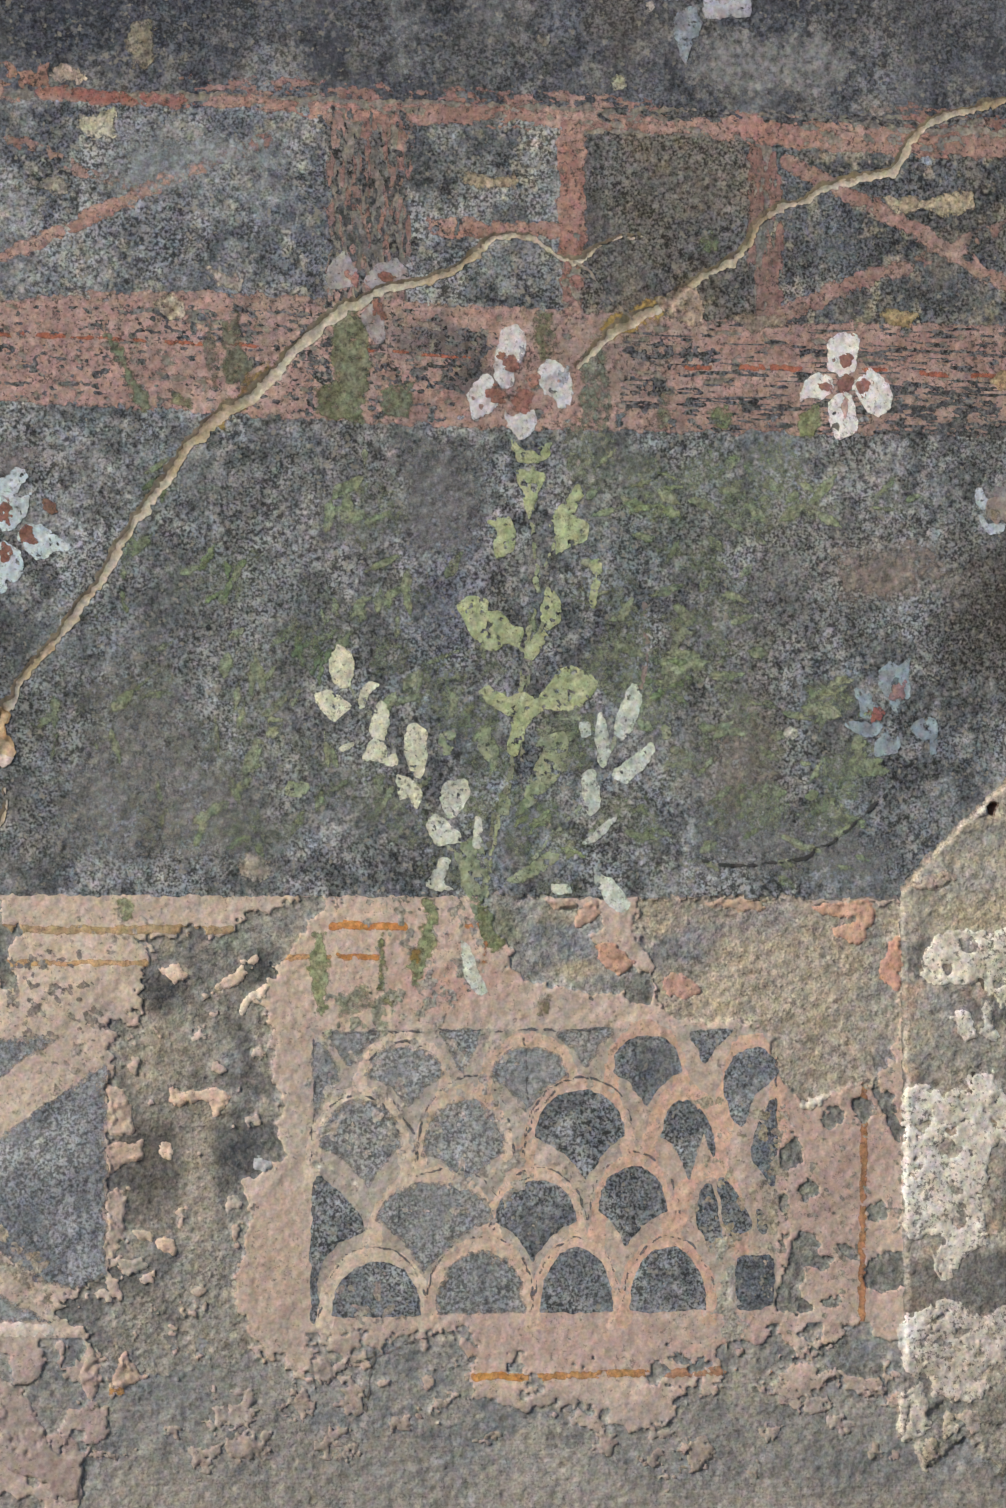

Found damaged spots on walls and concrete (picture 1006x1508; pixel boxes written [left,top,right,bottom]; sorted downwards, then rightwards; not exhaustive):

crack [0,96,1006,712]
crack [0,787,8,827]
crack [702,778,902,867]
peeling [0,777,1006,1508]